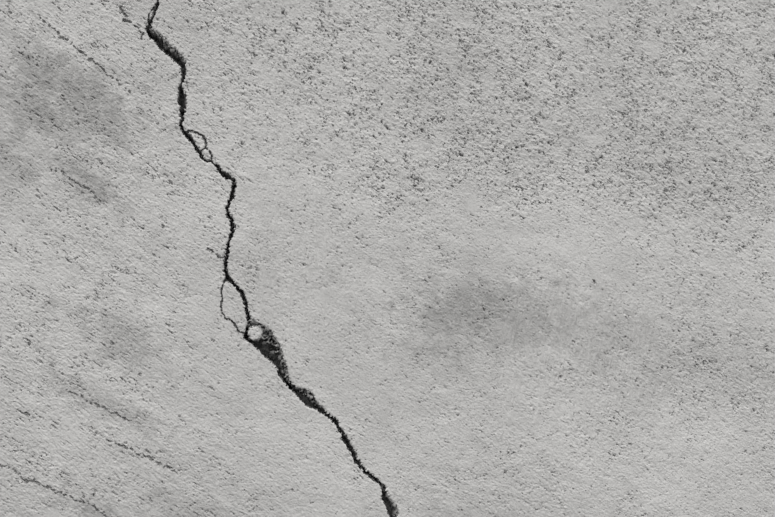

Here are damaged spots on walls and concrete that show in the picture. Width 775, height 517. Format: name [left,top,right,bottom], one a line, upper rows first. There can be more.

crack [119,0,296,392]
crack [319,409,388,514]